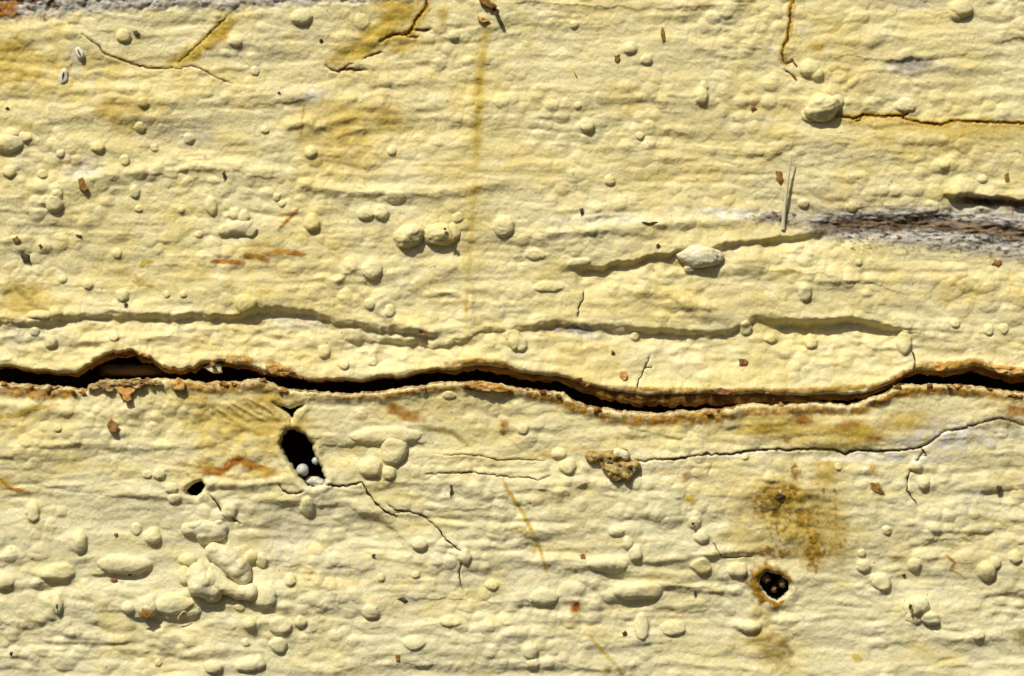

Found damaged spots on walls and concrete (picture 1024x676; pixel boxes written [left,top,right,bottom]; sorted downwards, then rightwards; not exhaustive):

crack [85,18,232,84]
crack [326,0,431,73]
crack [780,0,797,81]
crack [836,111,1024,128]
crack [0,350,1024,506]
crack [327,481,463,589]